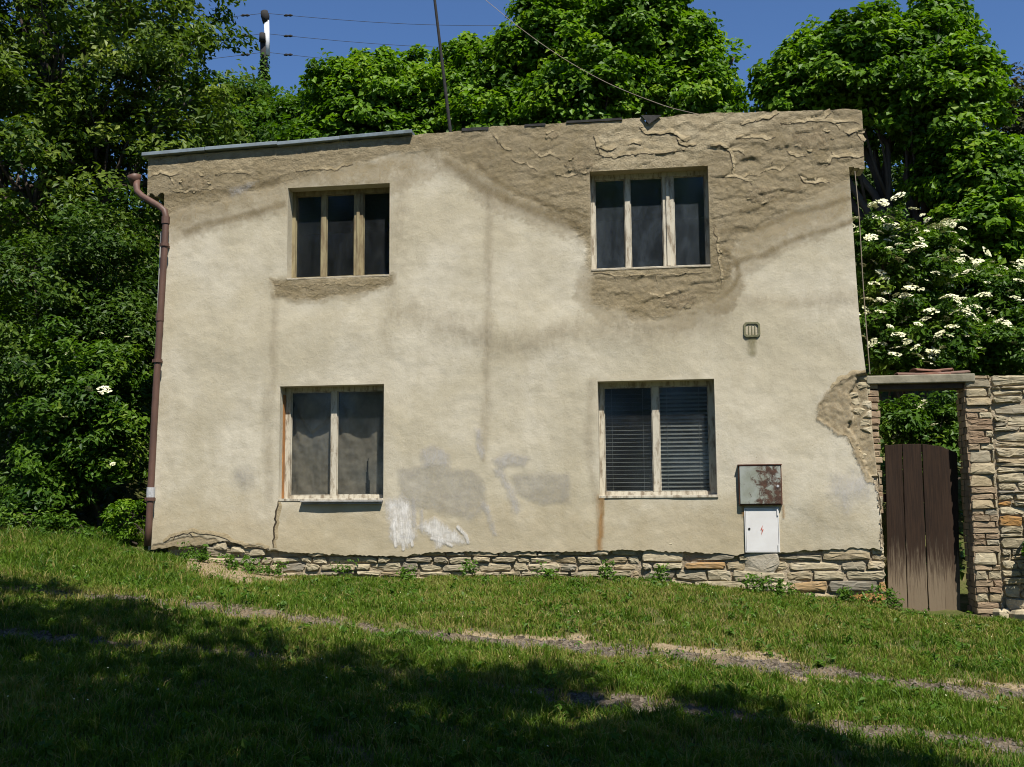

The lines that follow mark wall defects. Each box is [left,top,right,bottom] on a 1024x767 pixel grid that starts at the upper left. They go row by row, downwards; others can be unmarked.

crack [163,501,282,550]
spalling [816,371,884,548]